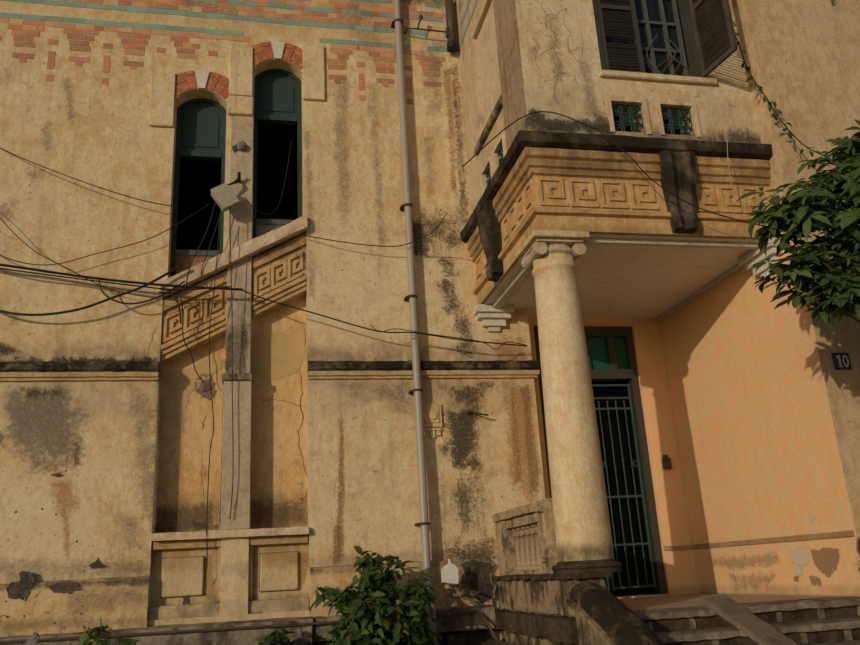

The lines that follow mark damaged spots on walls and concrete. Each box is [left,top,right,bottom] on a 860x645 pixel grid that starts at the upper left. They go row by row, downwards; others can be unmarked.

crack [532,2,583,106]
leakage [0,386,85,473]
peeling [167,352,223,426]
crack [260,372,308,512]
leakage [440,381,494,470]
corrosion [505,387,539,501]
corrosion [333,422,345,562]
leakage [455,483,484,529]
flaking render [5,570,34,602]
flaking render [49,582,82,594]
leakage [439,538,495,603]
peeling [790,546,839,587]